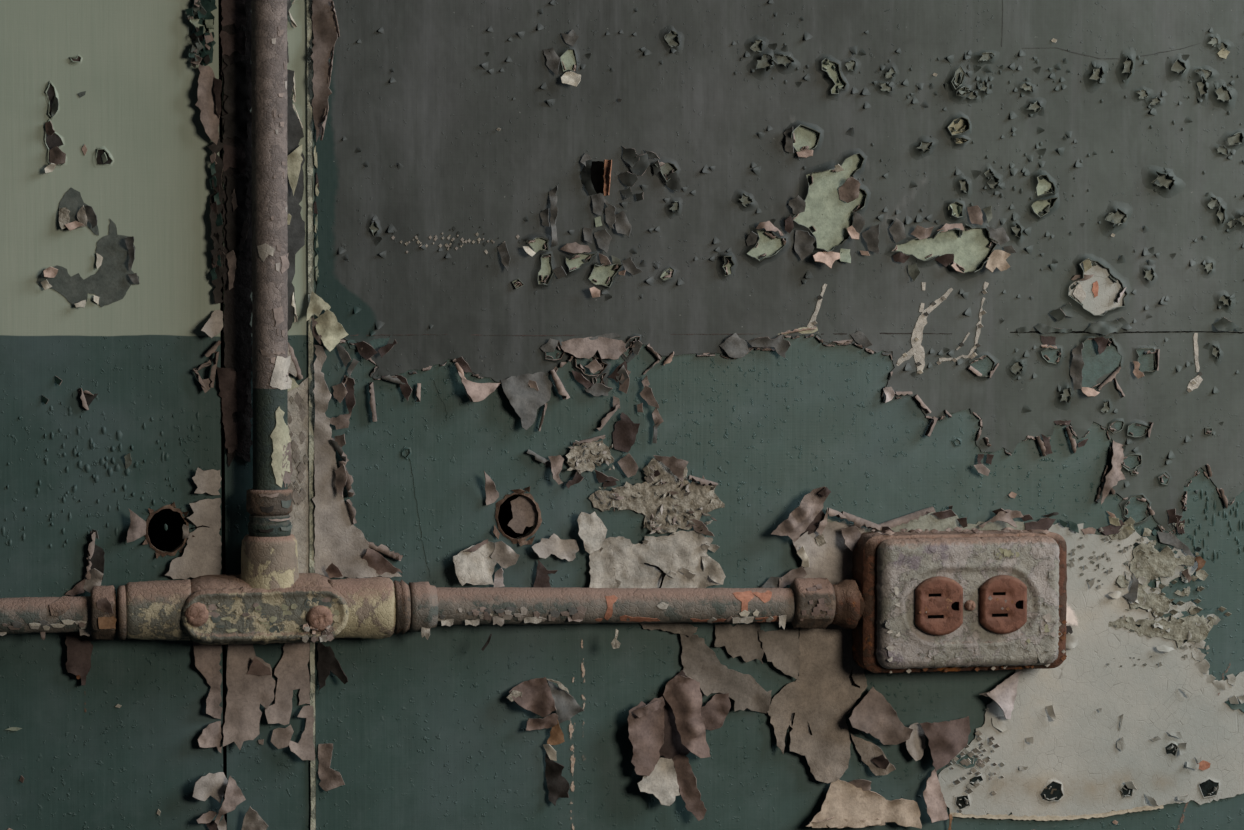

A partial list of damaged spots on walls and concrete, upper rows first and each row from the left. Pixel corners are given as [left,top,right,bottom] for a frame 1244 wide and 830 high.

peeling [43,81,68,173]
peeling [815,54,850,101]
peeling [37,187,140,308]
peeling [165,0,726,588]
peeling [697,326,952,437]
peeling [716,120,1017,284]
peeling [1025,169,1060,222]
peeling [1010,253,1244,398]
flaking render [627,412,1244,830]
peeling [193,772,268,830]
peeling [193,597,348,791]
peeling [506,677,584,806]